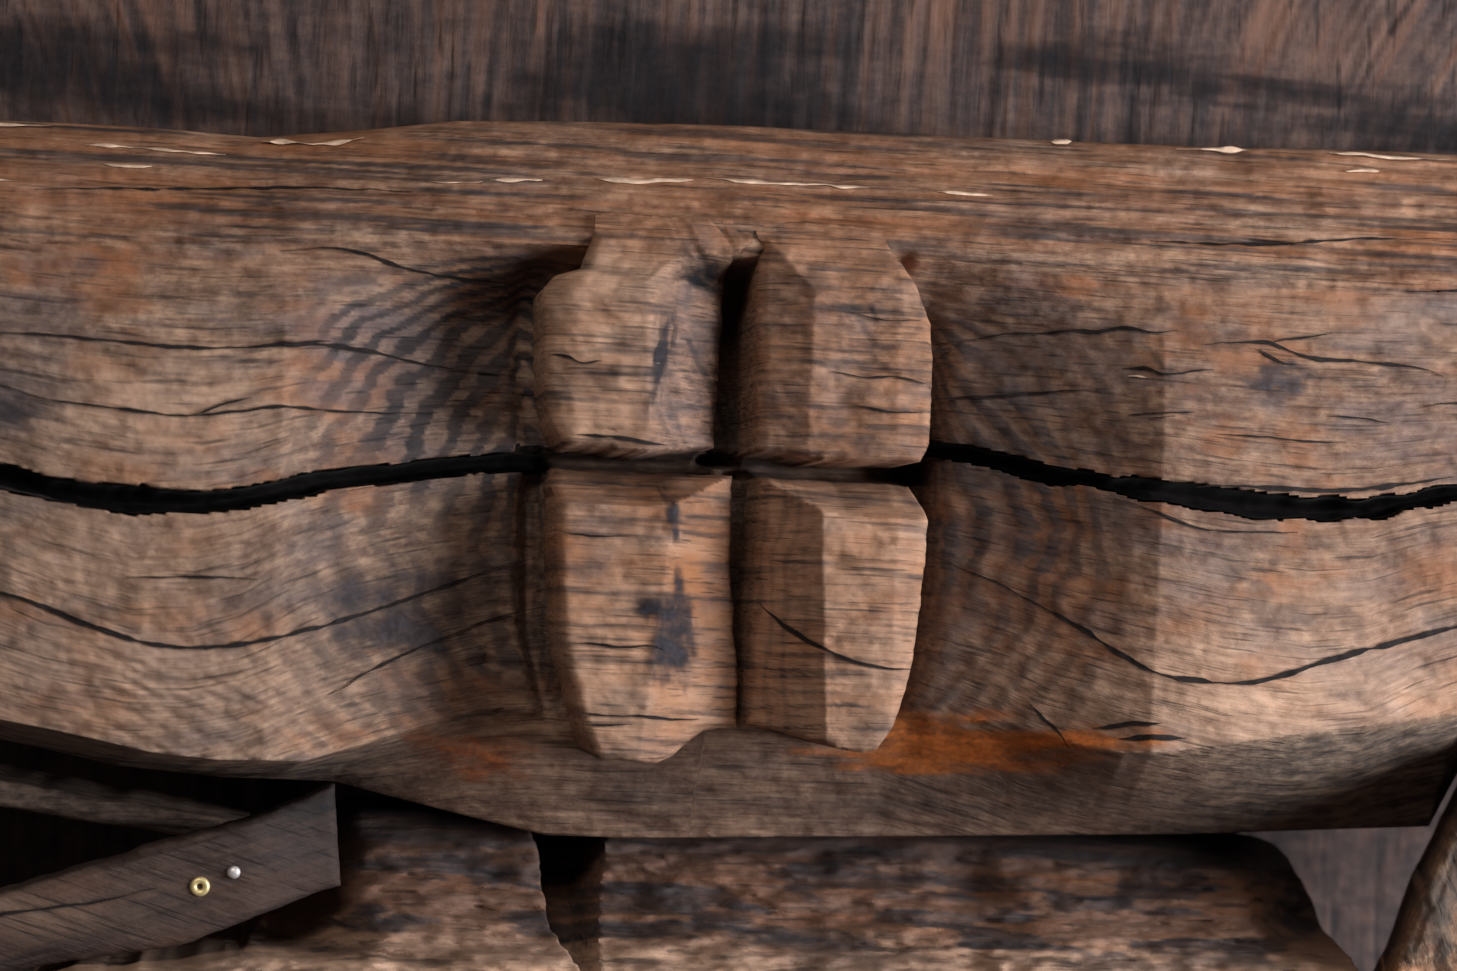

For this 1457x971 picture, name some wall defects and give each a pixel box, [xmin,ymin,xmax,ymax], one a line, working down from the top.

crack [35,185,413,193]
crack [1150,237,1440,246]
crack [0,332,521,378]
crack [1,385,437,417]
crack [577,434,668,446]
crack [832,312,1457,533]
crack [0,454,543,514]
crack [0,557,539,650]
crack [760,604,907,670]
crack [926,551,1457,685]
crack [577,712,698,727]
crack [1029,704,1186,748]